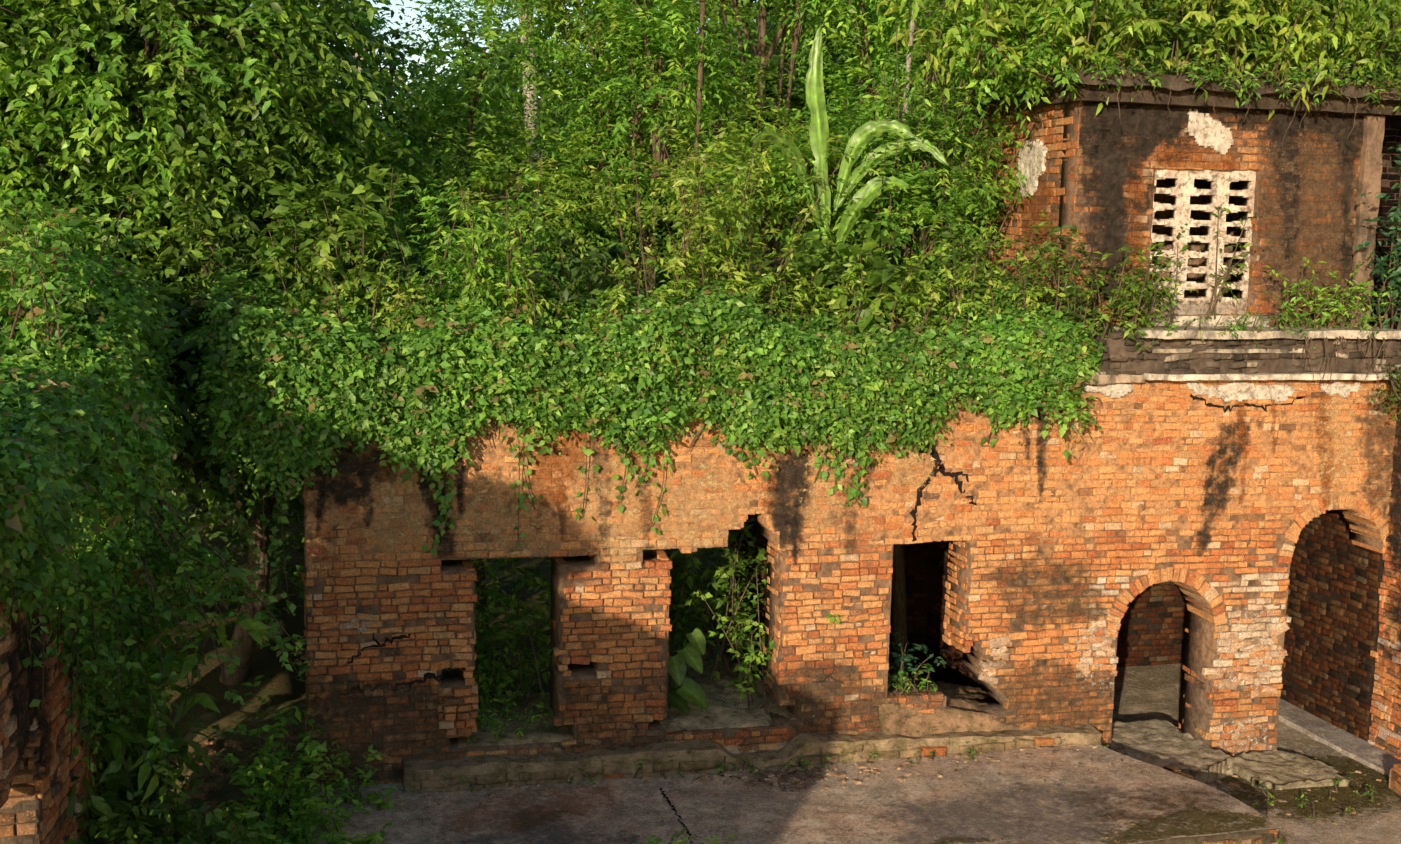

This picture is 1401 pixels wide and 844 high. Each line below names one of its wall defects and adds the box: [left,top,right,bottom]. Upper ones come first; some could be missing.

flaking render [1184,109,1233,154]
flaking render [1016,139,1052,249]
water stain [1078,102,1375,320]
crack [910,439,977,542]